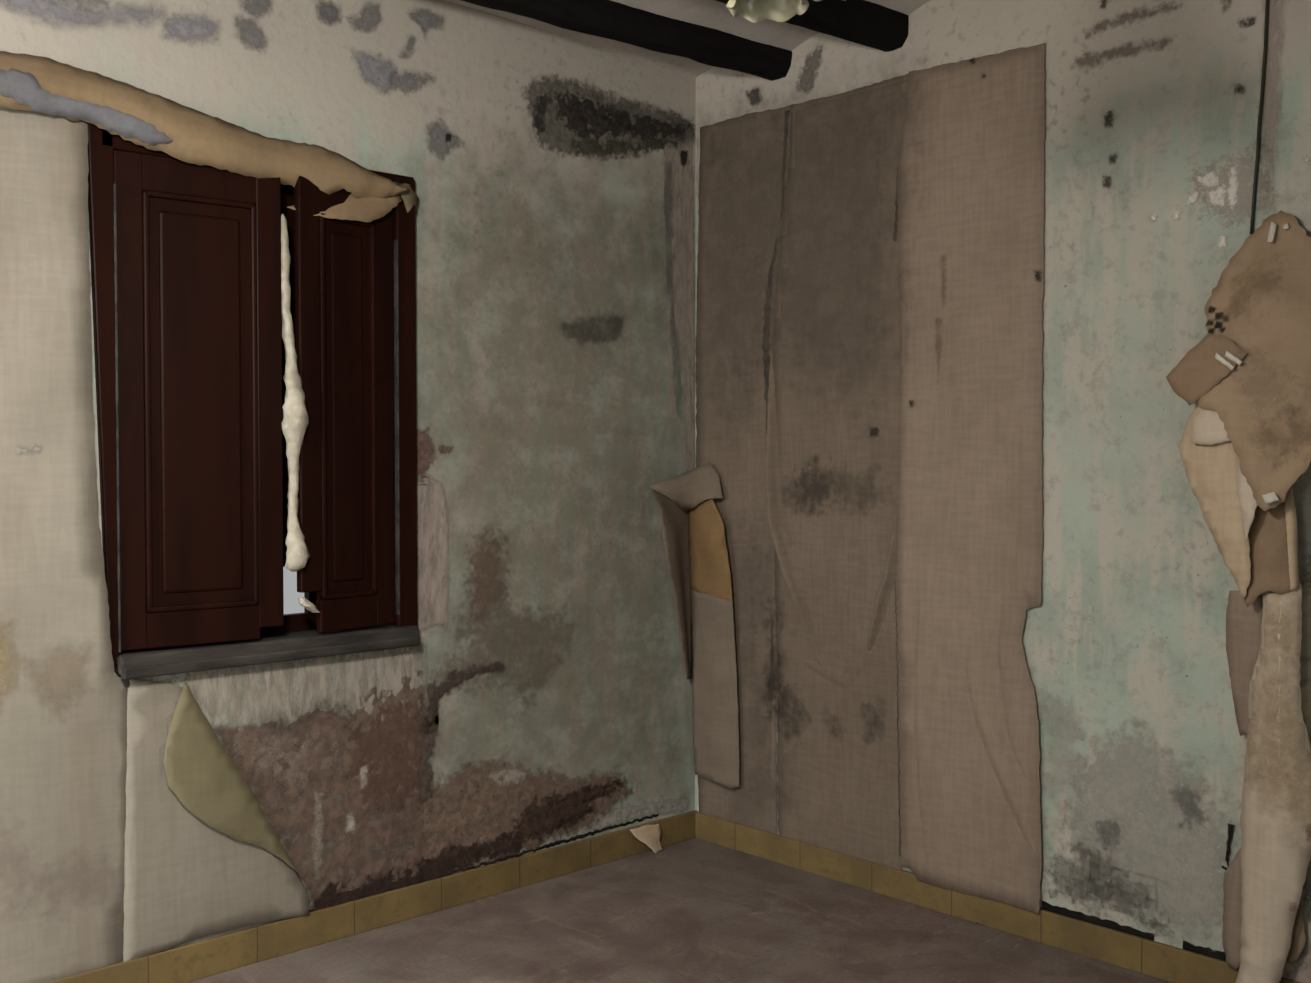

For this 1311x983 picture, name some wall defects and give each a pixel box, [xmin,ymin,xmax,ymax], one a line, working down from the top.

peeling [1267,221,1289,242]
peeling [1215,351,1243,370]
peeling [1262,492,1279,504]
flaking render [169,474,688,910]
leakage [1049,721,1228,938]
peeling [1288,949,1311,983]